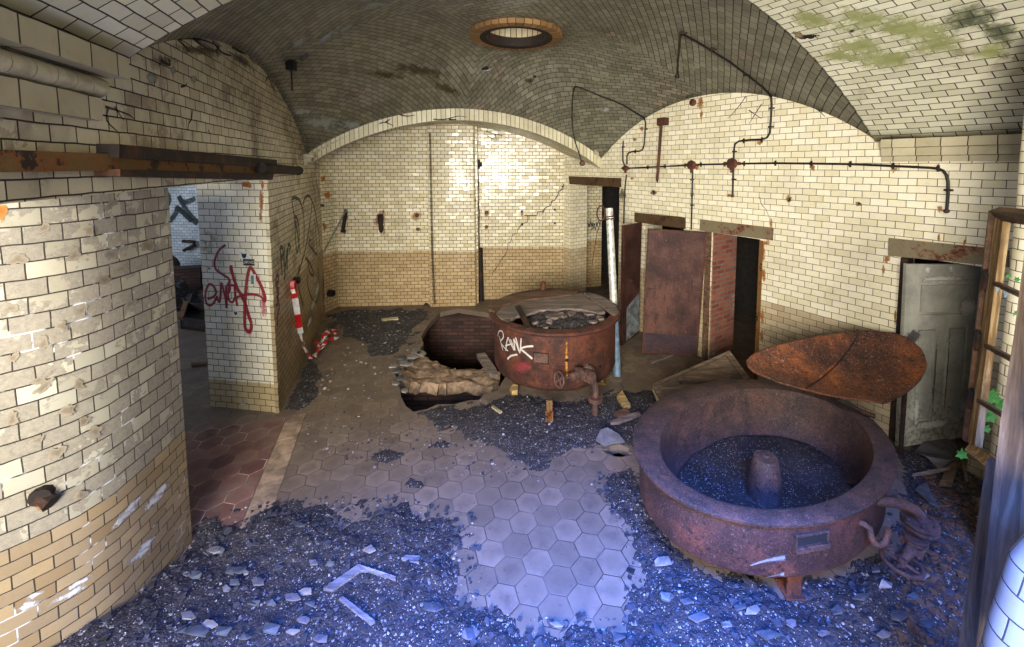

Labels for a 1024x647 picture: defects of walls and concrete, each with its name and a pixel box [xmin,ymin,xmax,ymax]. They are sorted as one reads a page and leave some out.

crack [492,184,564,273]
spalling [303,272,505,406]
spalling [400,391,482,412]